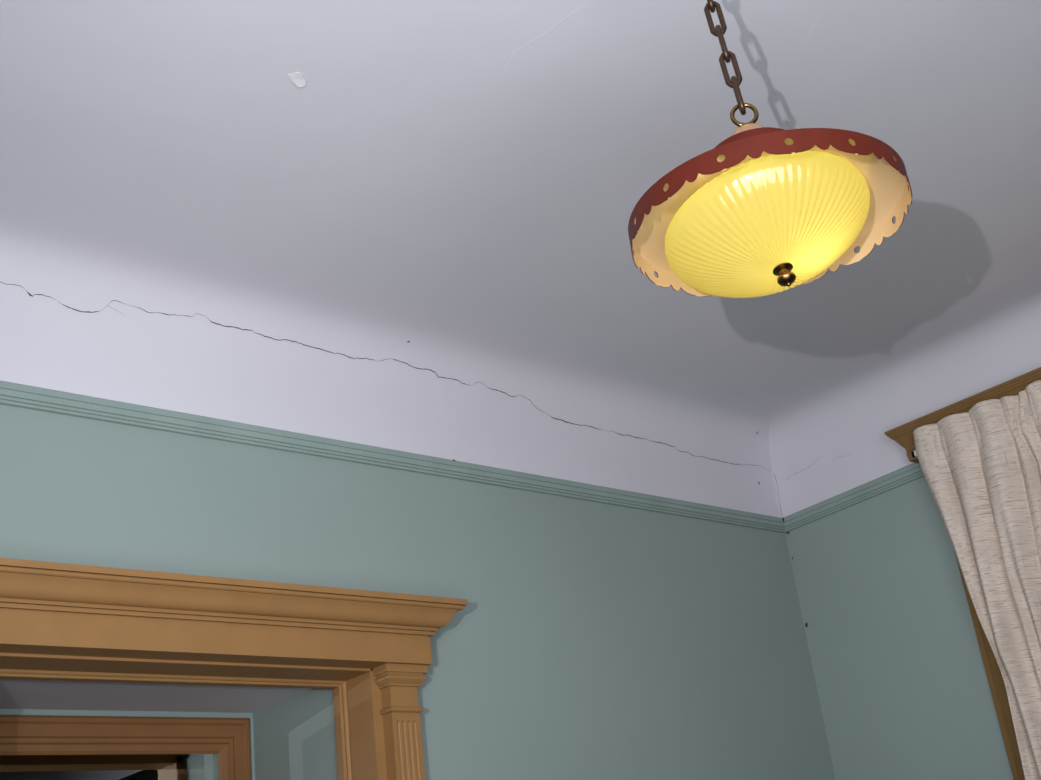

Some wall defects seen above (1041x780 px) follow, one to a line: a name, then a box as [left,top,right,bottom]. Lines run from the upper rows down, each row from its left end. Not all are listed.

crack [1,282,850,514]